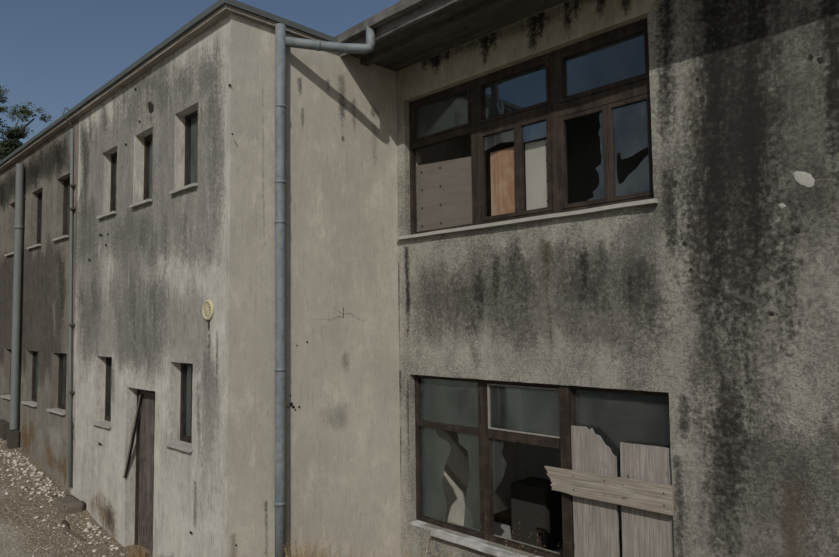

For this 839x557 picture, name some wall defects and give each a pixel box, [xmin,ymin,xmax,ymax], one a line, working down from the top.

leakage [657,0,674,133]
leakage [0,140,69,206]
spalling [793,171,815,187]
leakage [664,0,783,512]